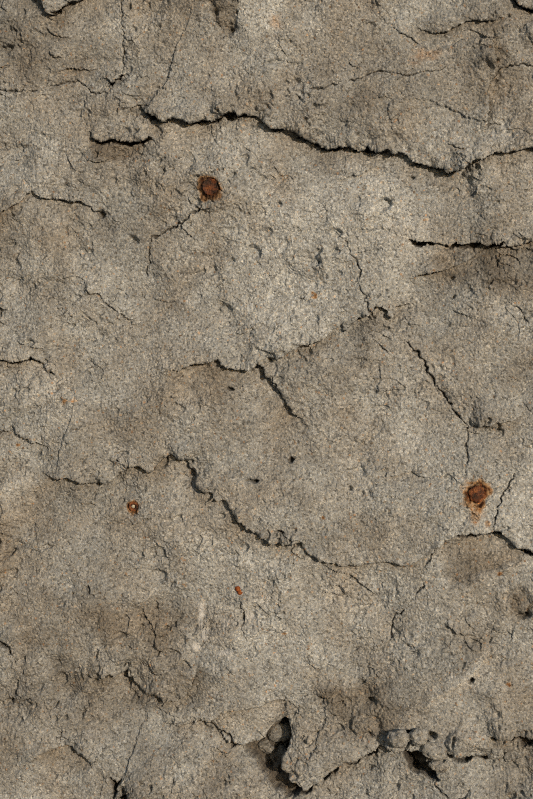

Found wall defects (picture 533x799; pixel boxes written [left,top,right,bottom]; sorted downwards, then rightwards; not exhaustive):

crack [0,81,112,96]
crack [316,67,446,90]
rust [196,174,225,203]
crack [147,197,220,276]
rust [126,498,142,517]
rust [459,476,495,531]
crack [493,475,514,532]
spalling [47,653,439,799]
flaking render [446,728,533,765]